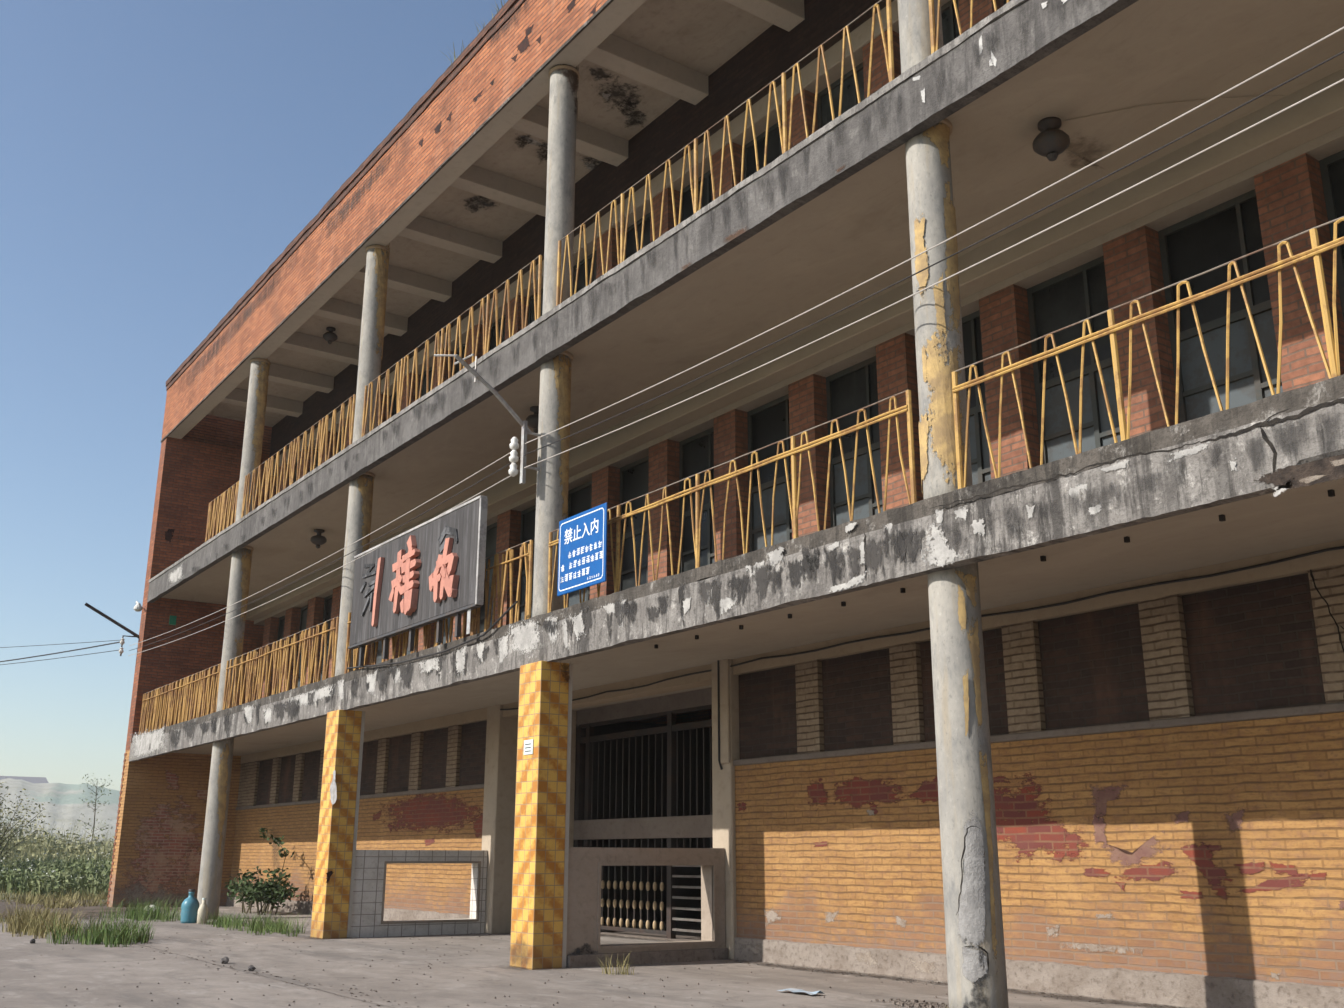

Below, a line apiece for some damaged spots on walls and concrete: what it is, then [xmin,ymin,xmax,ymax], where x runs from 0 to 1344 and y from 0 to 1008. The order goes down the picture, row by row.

leakage [590,68,646,127]
peeling [914,123,965,488]
peeling [1101,460,1129,472]
crack [929,398,1344,509]
peeling [1167,441,1210,462]
leakage [1250,439,1263,469]
leakage [543,527,925,641]
peeling [921,507,985,736]
peeling [807,775,938,814]
crack [956,826,985,915]
peeling [958,745,1327,983]
crack [962,946,989,971]